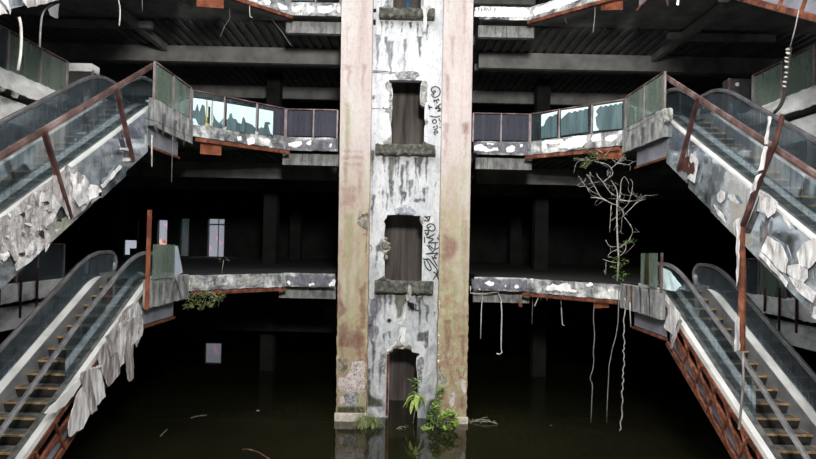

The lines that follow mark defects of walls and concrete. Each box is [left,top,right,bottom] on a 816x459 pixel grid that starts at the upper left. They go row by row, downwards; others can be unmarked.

peeling [252,0,341,14]
peeling [474,0,577,18]
leakage [376,21,429,69]
spalling [384,71,428,122]
spalling [394,205,424,225]
peeling [757,190,791,229]
peeling [216,276,264,286]
peeling [546,283,577,293]
peeling [758,236,816,319]
peeling [337,355,366,406]